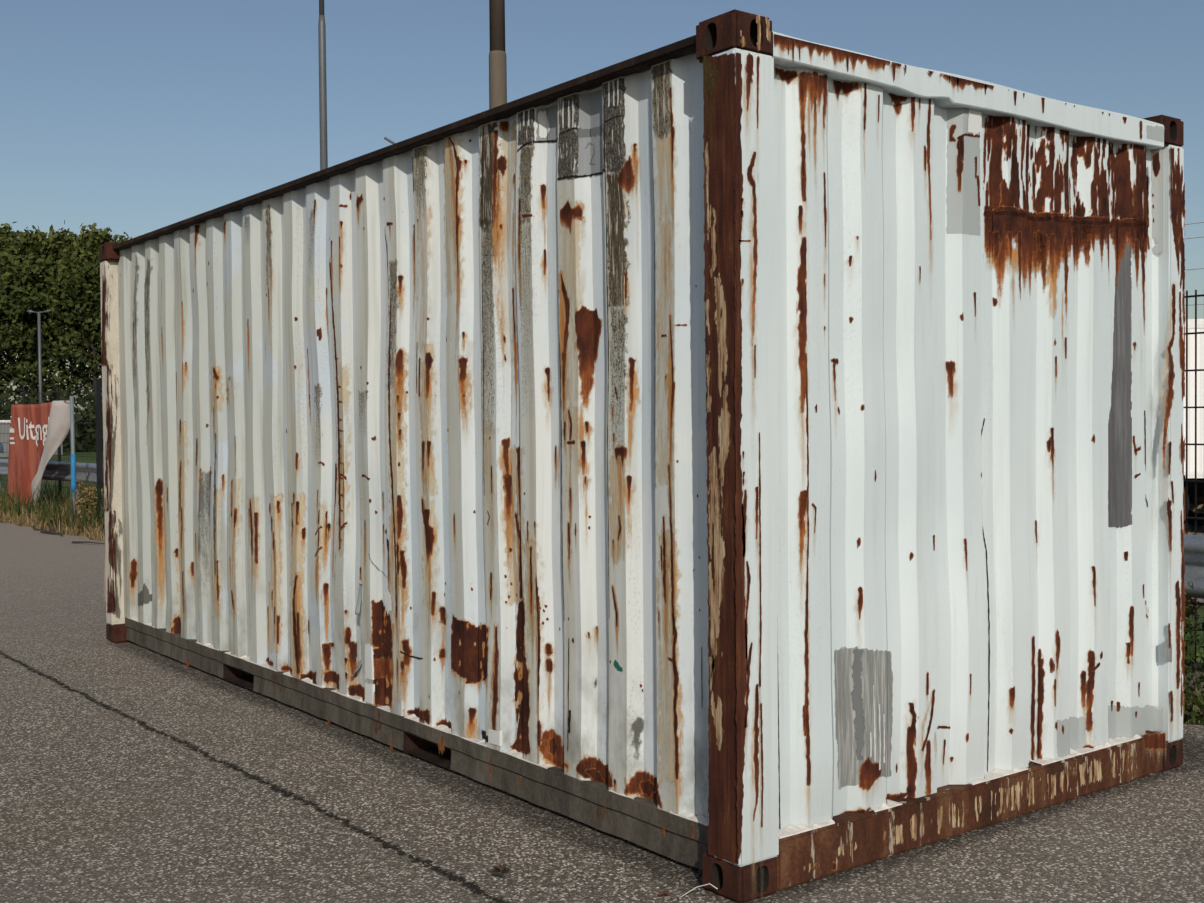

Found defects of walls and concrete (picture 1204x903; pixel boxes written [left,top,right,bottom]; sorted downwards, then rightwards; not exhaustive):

corrosion [196,437,662,809]
corrosion [448,137,471,418]
corrosion [492,121,584,404]
peeling [518,94,579,180]
crack [561,533,569,751]
corrosion [542,249,602,573]
peeling [603,78,626,173]
corrosion [658,314,687,810]
corrosion [692,52,764,864]
corrosion [774,34,932,791]
corrosion [886,672,954,800]
corrosion [928,70,1186,760]